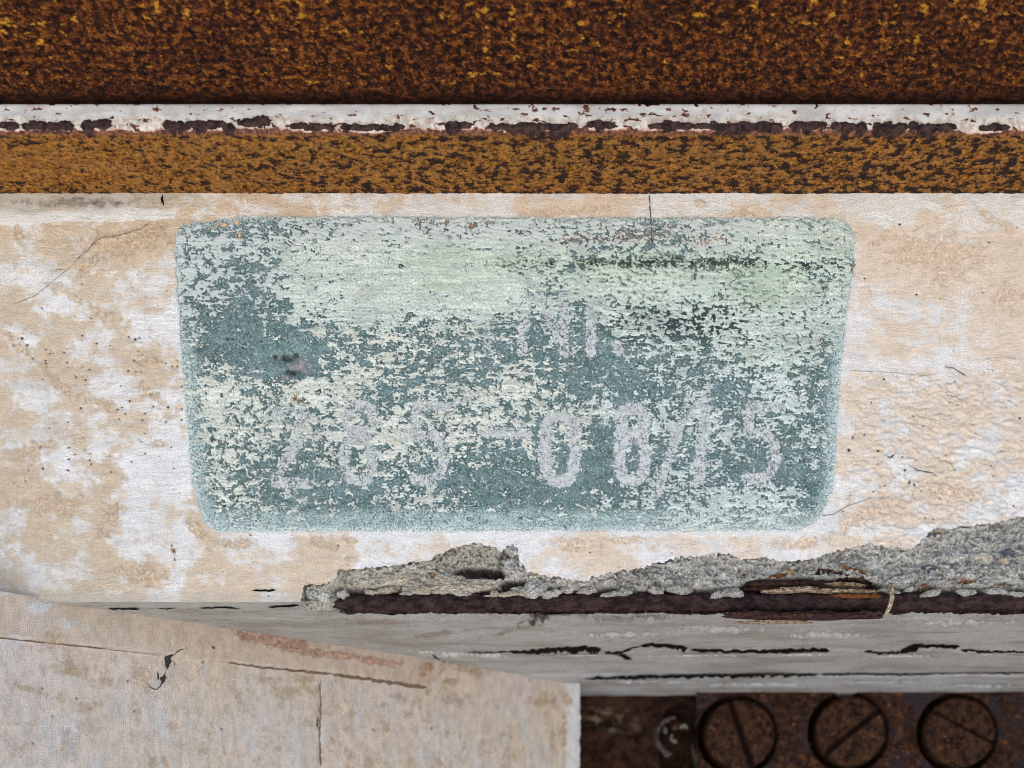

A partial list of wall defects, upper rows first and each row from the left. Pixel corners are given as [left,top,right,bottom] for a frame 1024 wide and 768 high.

peeling [0,104,1024,135]
rust [651,120,958,141]
peeling [175,200,1024,639]
rust [518,612,565,629]
crack [0,637,199,690]
crack [432,638,1024,680]
crack [228,662,427,766]